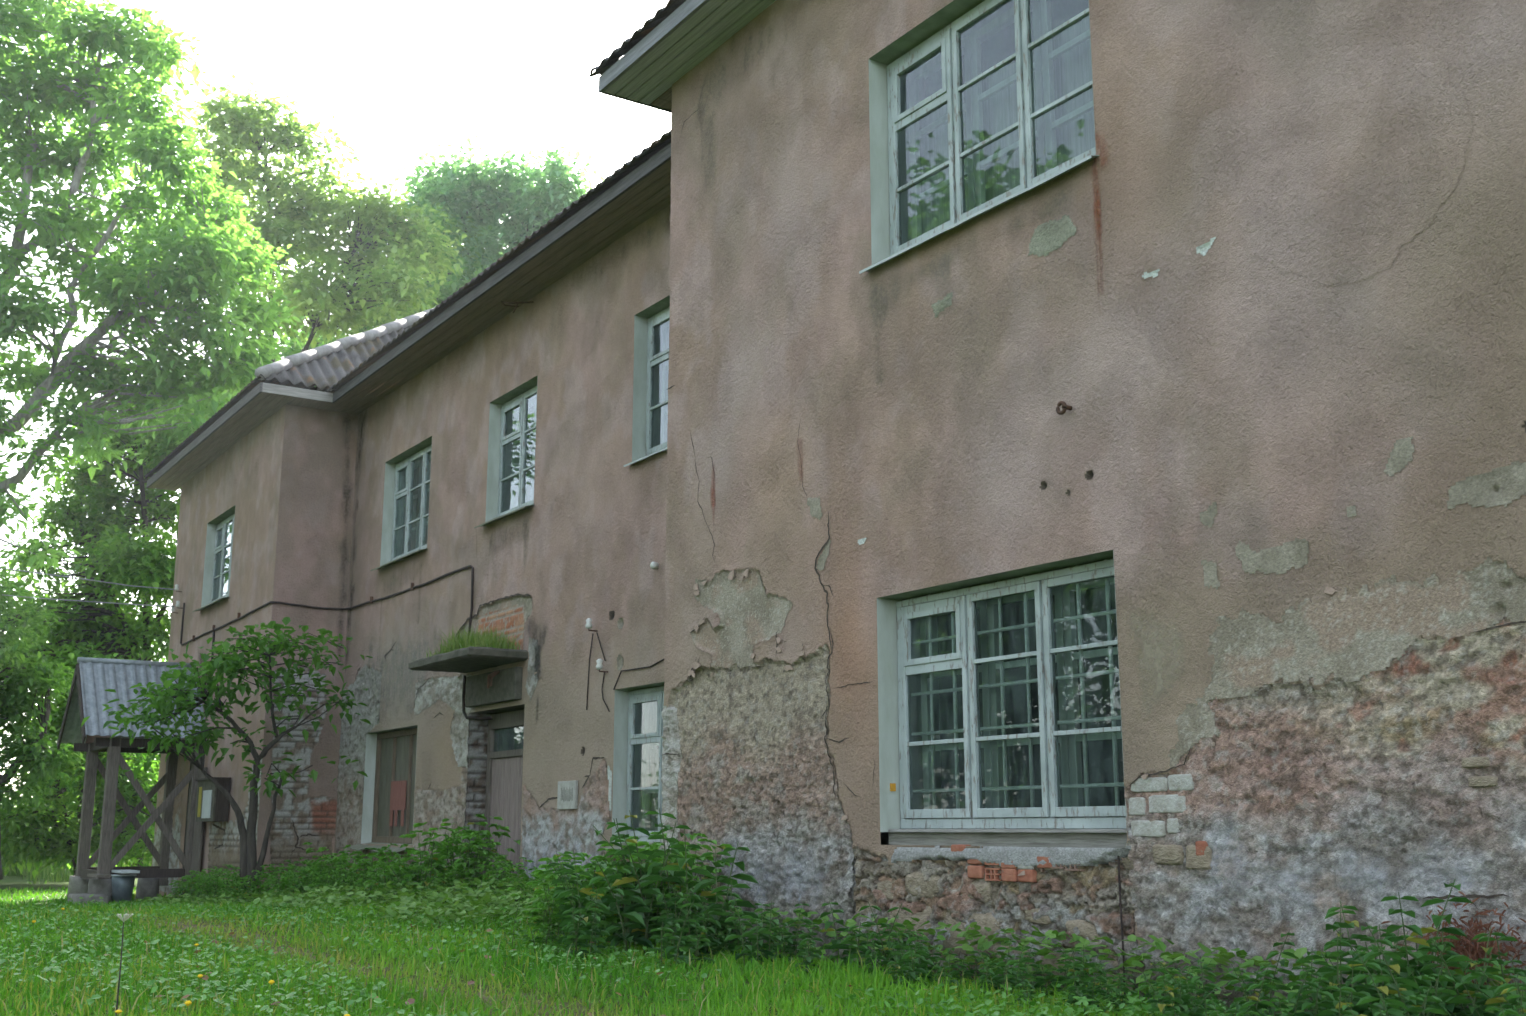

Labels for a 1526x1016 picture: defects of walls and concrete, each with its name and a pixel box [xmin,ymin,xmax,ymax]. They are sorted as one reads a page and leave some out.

flaking render [456,596,538,701]
crack [797,419,875,798]
flaking render [1235,538,1309,575]
flaking render [413,674,475,874]
flaking render [521,759,612,892]
flaking render [661,568,855,964]
flaking render [1124,557,1526,1016]